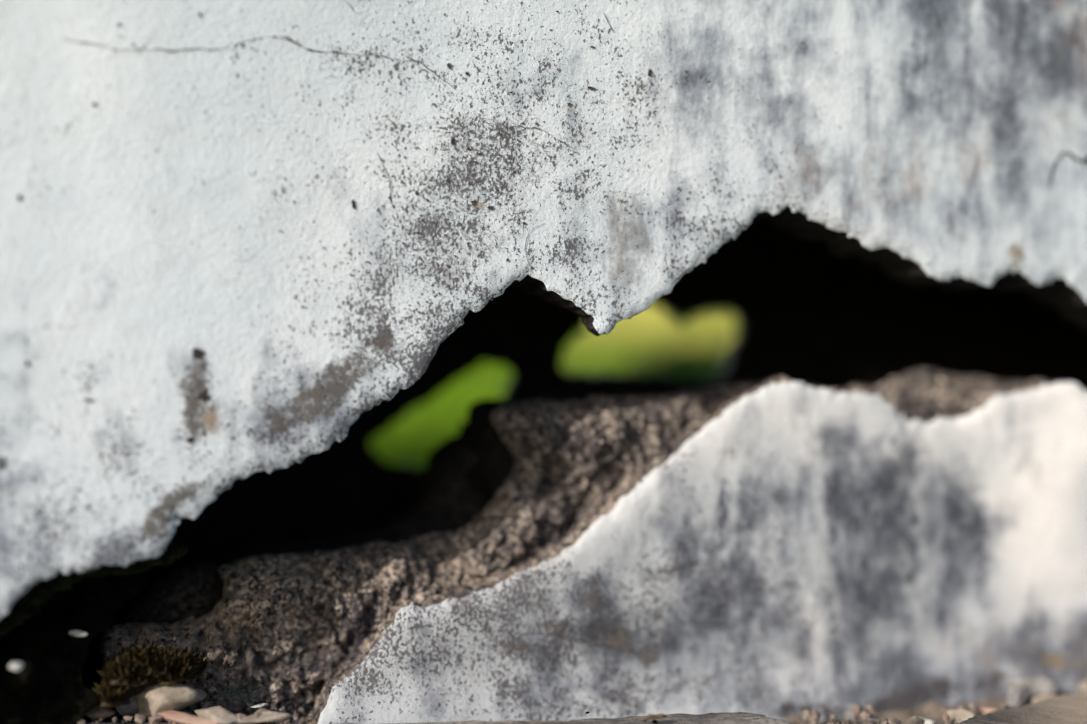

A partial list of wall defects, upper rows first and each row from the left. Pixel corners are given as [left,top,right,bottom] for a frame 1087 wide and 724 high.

crack [65,36,456,90]
crack [476,113,572,148]
crack [1048,151,1087,189]
damp [412,128,533,281]
damp [179,348,211,443]
damp [264,330,393,434]
spalling [805,366,1027,420]
spalling [92,378,764,724]
damp [537,584,659,669]
damp [778,703,796,717]
damp [867,678,950,716]